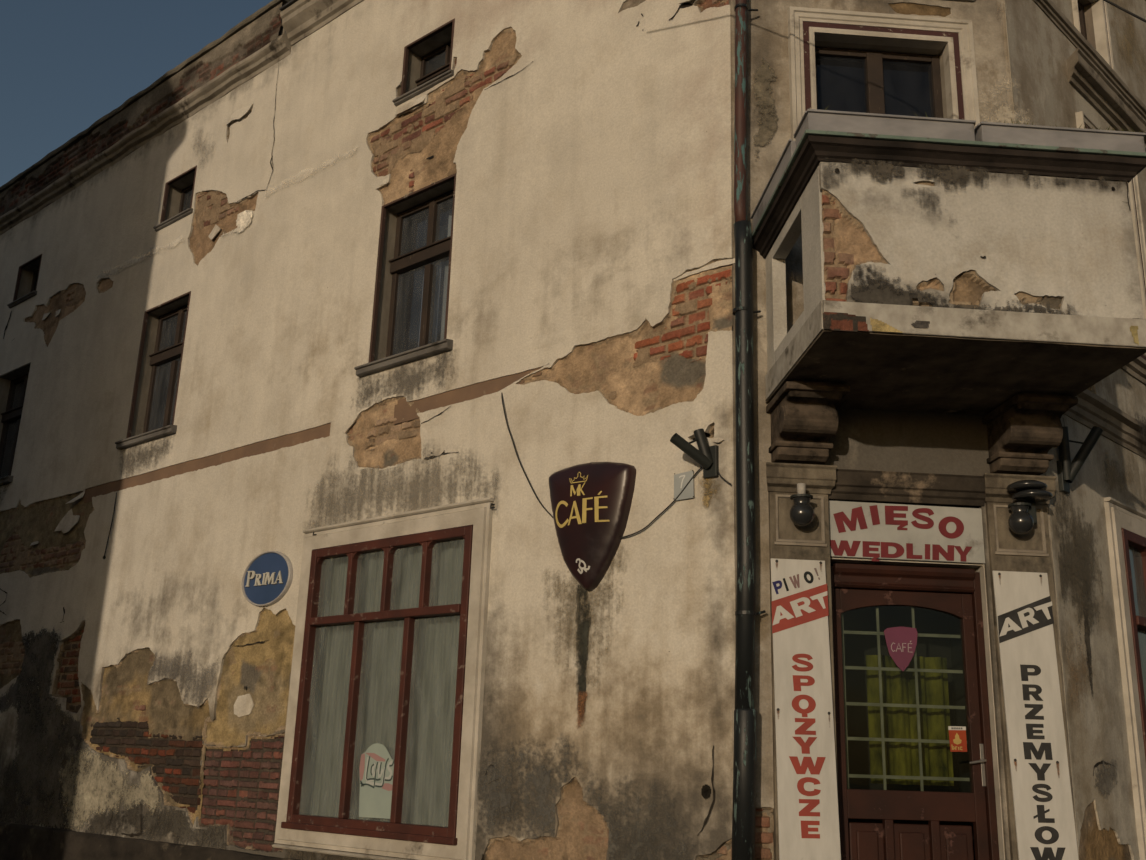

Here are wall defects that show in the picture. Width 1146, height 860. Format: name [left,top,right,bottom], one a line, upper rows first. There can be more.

crack [237,66,279,202]
spalling [367,27,522,205]
spalling [189,190,258,265]
spalling [518,258,735,416]
spalling [822,190,930,333]
spalling [912,271,995,308]
spalling [344,396,422,469]
spalling [0,491,94,578]
water stain [555,557,621,727]
water stain [0,629,225,850]
spalling [52,608,295,852]
peeling [1079,801,1131,860]